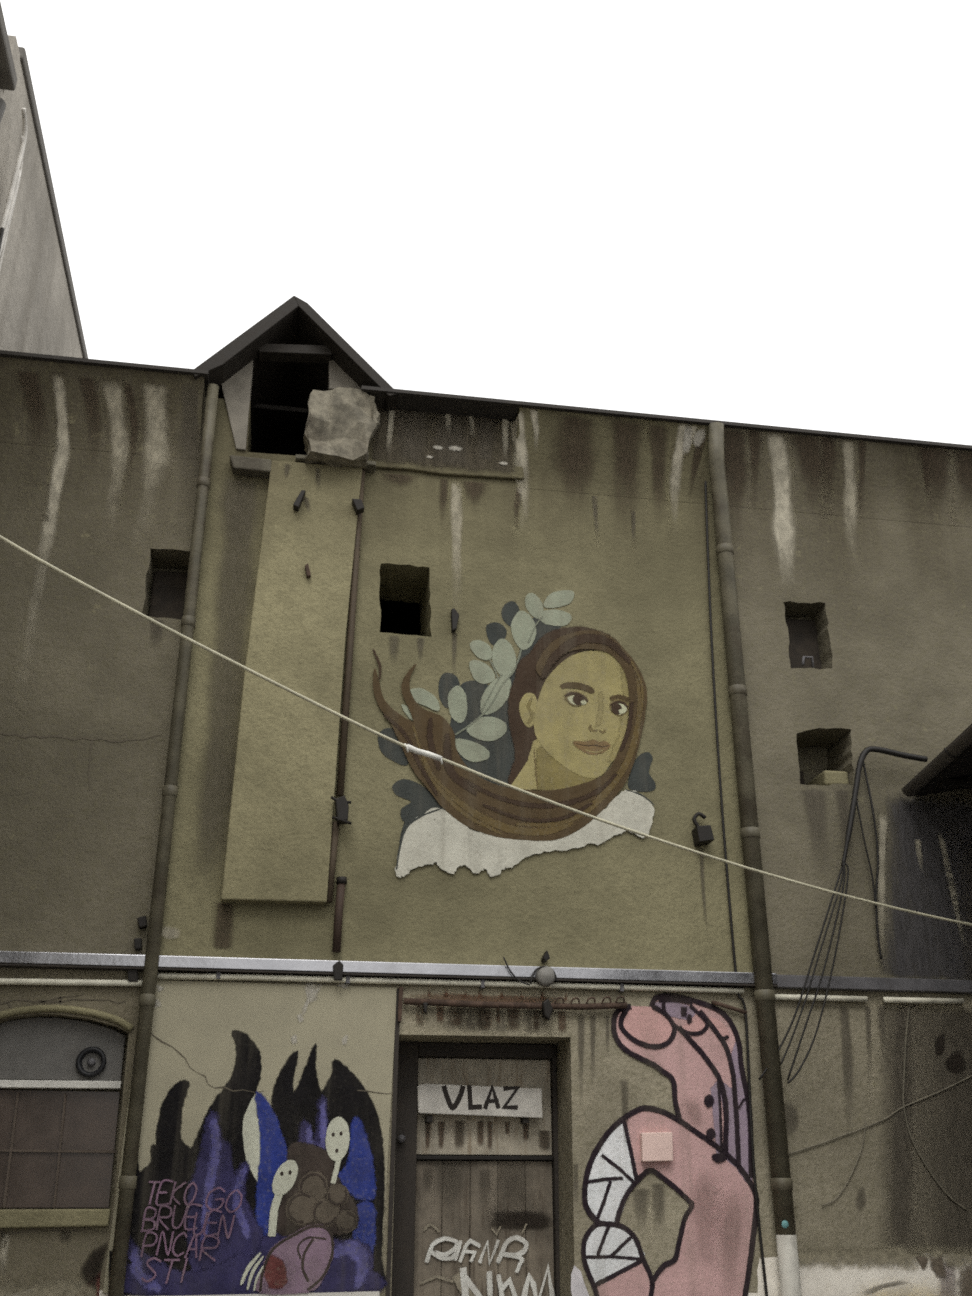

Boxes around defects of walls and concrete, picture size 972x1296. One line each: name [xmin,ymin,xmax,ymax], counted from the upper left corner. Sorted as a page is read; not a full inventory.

water stain [82,379,166,466]
water stain [21,373,68,549]
water stain [372,408,538,557]
water stain [616,423,705,489]
water stain [725,432,865,557]
crack [0,994,126,1009]
rust [398,987,627,1029]
crack [151,1033,261,1092]
flaking render [916,1256,972,1296]